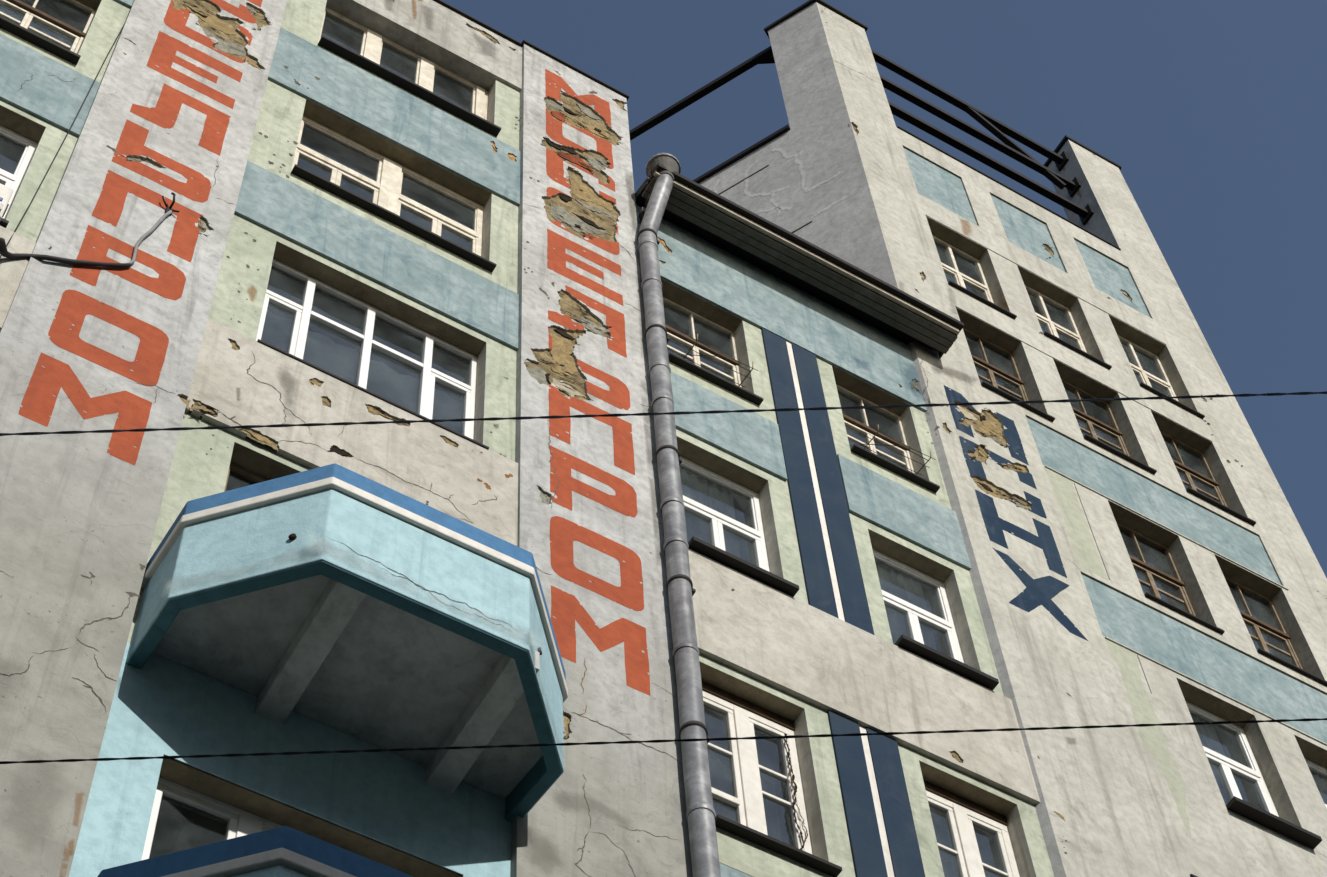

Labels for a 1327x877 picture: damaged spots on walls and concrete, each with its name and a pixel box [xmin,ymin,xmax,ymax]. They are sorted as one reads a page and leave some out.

spalling [172,0,271,70]
spalling [541,91,623,242]
spalling [524,282,614,400]
spalling [180,396,228,455]
spalling [240,429,279,451]
crack [247,352,498,523]
peeling [367,405,409,426]
spalling [926,400,1027,473]
spalling [971,477,1031,510]
crack [328,537,520,636]
crack [3,595,131,713]
crack [575,775,678,877]